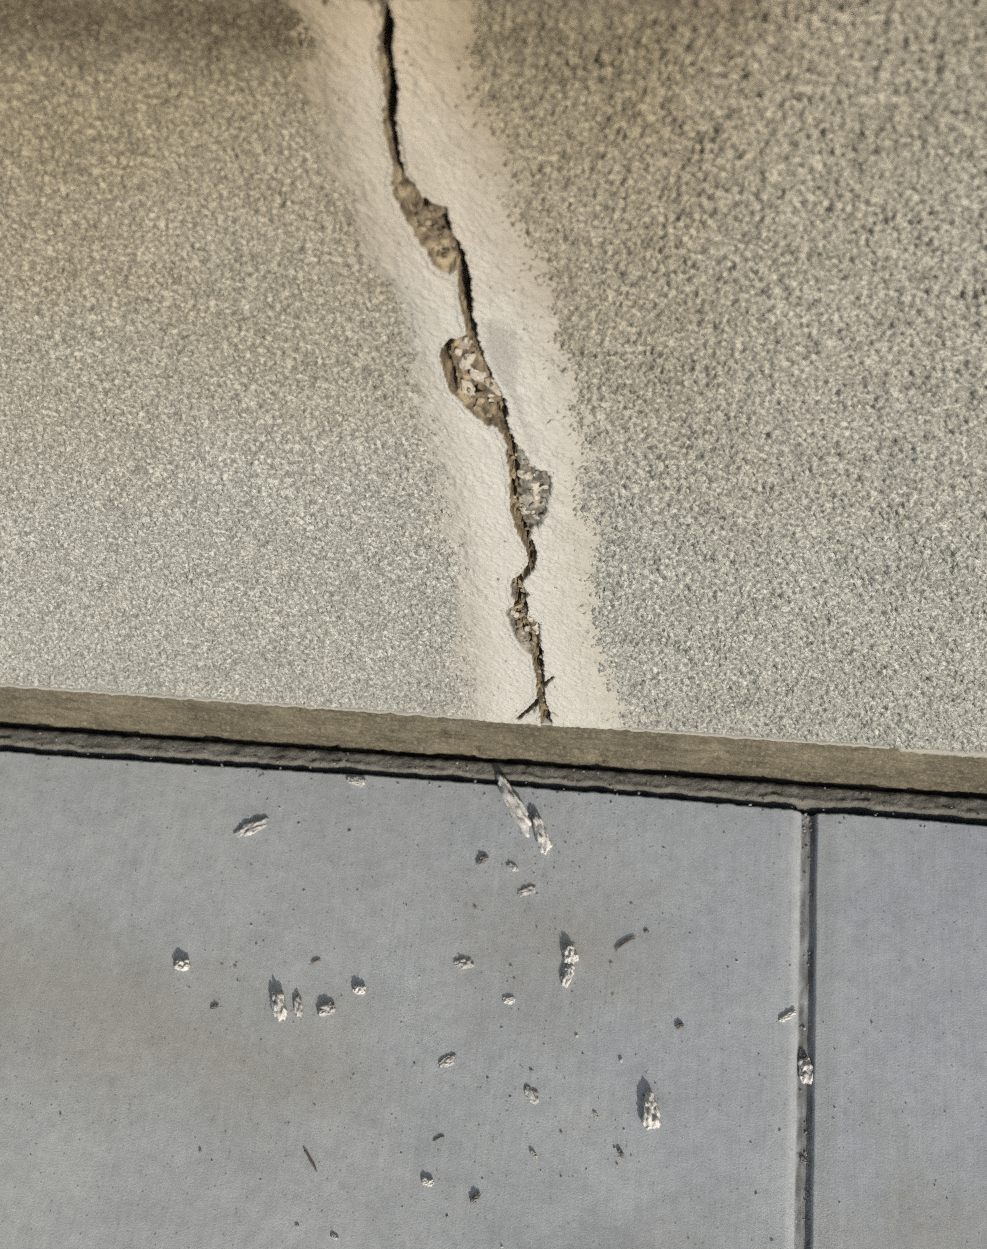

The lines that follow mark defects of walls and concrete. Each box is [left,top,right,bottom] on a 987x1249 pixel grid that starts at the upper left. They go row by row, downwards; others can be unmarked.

flaking render [384,124,460,281]
crack [370,0,562,726]
flaking render [435,318,514,431]
flaking render [499,445,557,539]
flaking render [500,575,546,657]